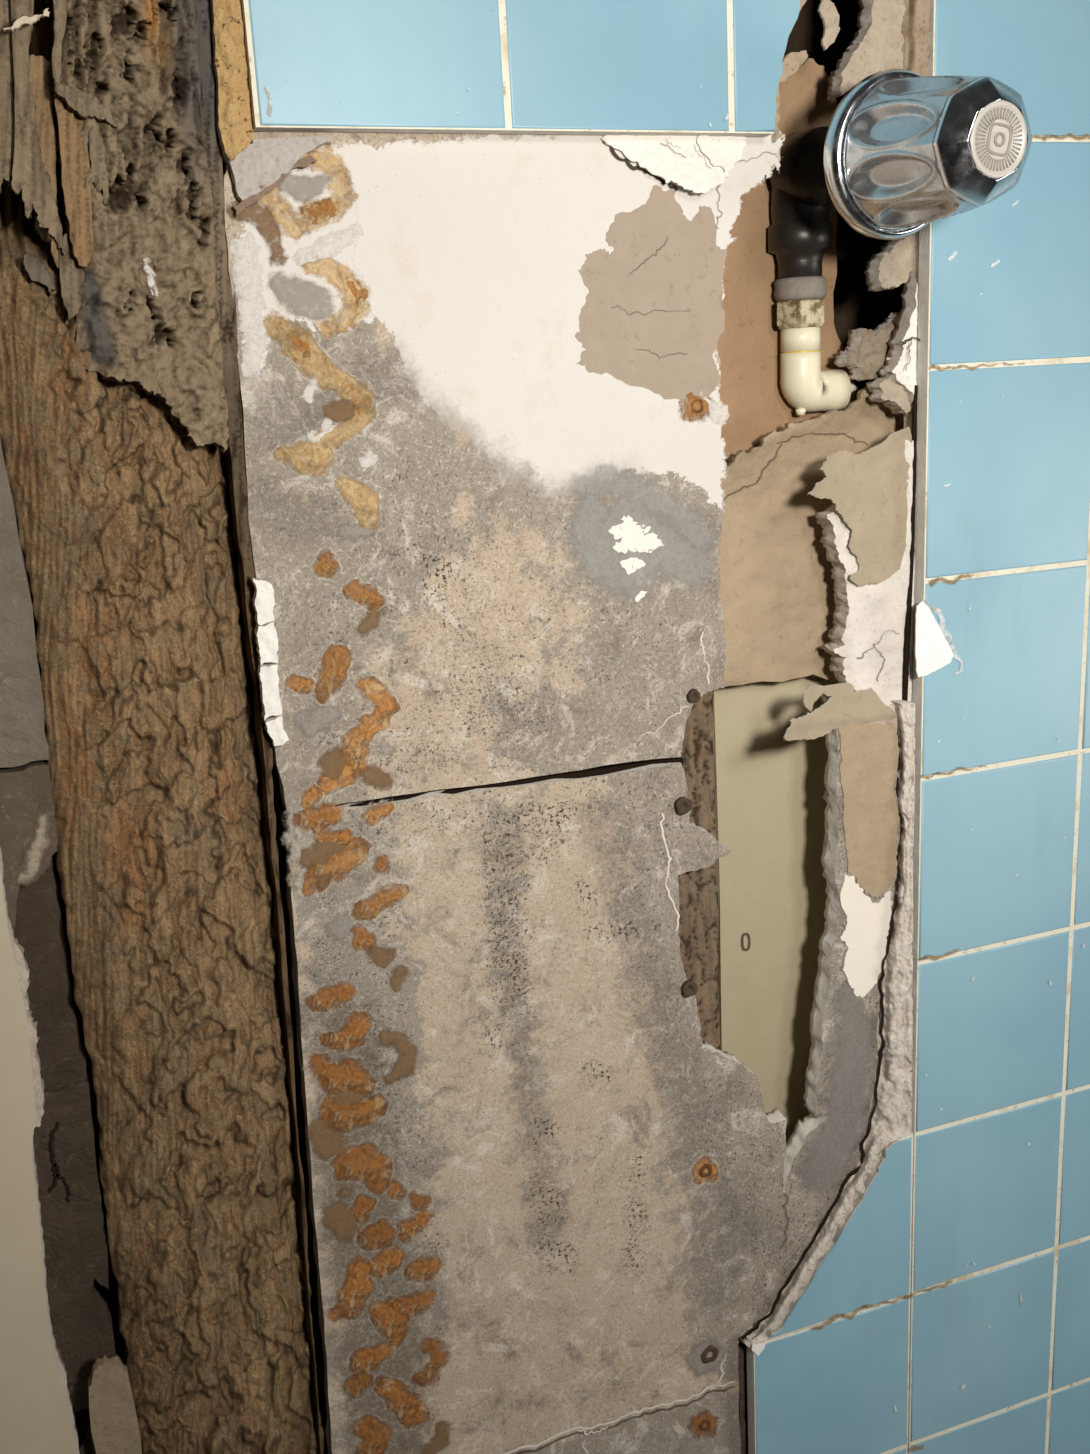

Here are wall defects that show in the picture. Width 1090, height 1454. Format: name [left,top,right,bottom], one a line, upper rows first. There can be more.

crack [602,141,678,191]
peeling [228,129,785,602]
corrosion [678,392,713,422]
spalling [834,234,919,417]
water stain [415,530,452,604]
corrosion [283,548,410,992]
crack [280,632,710,822]
water stain [482,801,570,1001]
water stain [574,875,639,942]
crack [503,337,920,1454]
spalling [739,440,954,1356]
corrosion [304,983,452,1454]